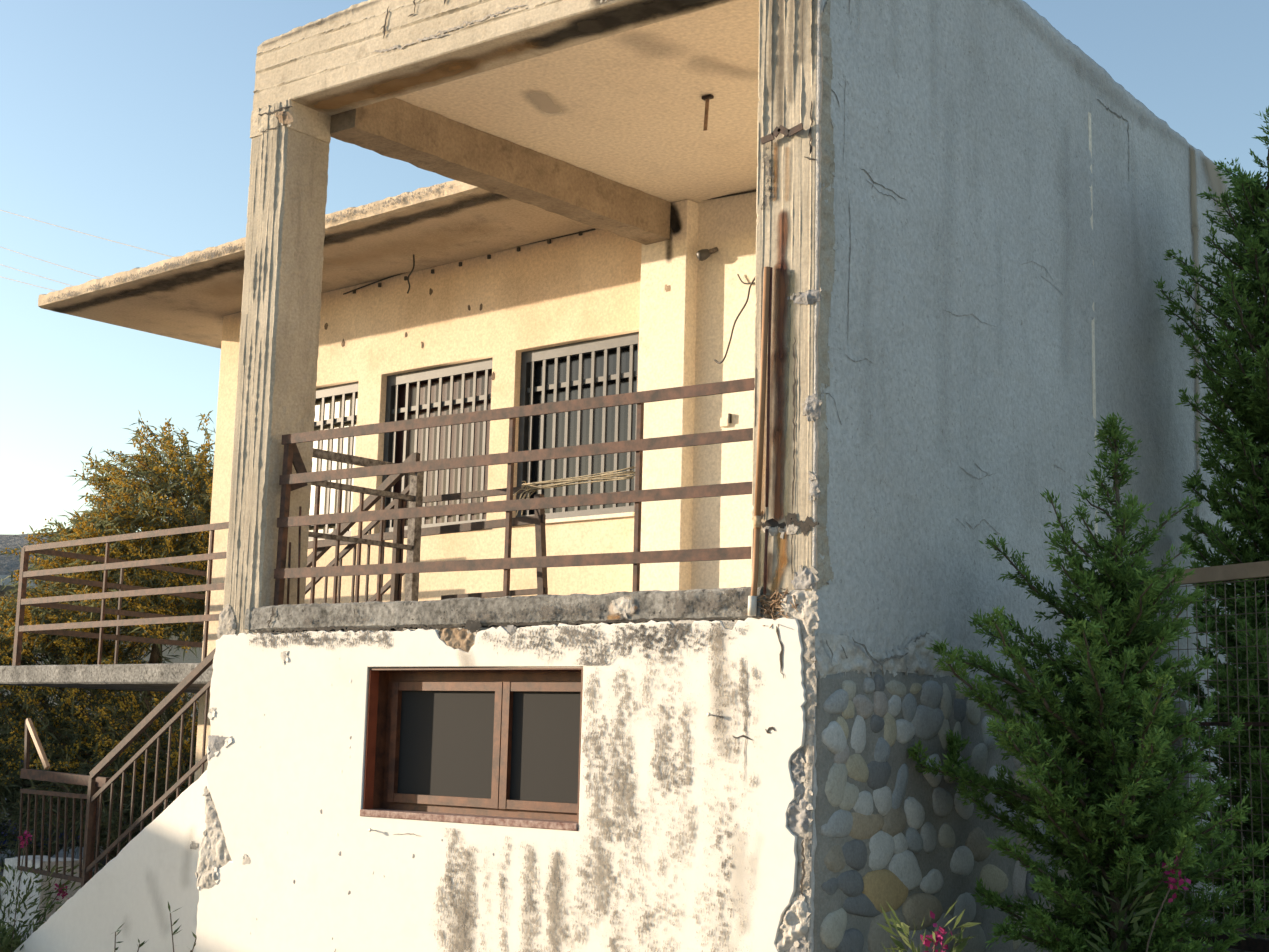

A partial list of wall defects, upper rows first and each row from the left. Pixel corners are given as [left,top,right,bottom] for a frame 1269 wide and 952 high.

leakage [310,43,535,111]
crack [1097,99,1129,171]
leakage [783,274,795,516]
spalling [762,0,963,952]
spalling [436,618,481,652]
spalling [207,735,233,761]
leakage [434,532,765,952]
spalling [190,786,250,890]